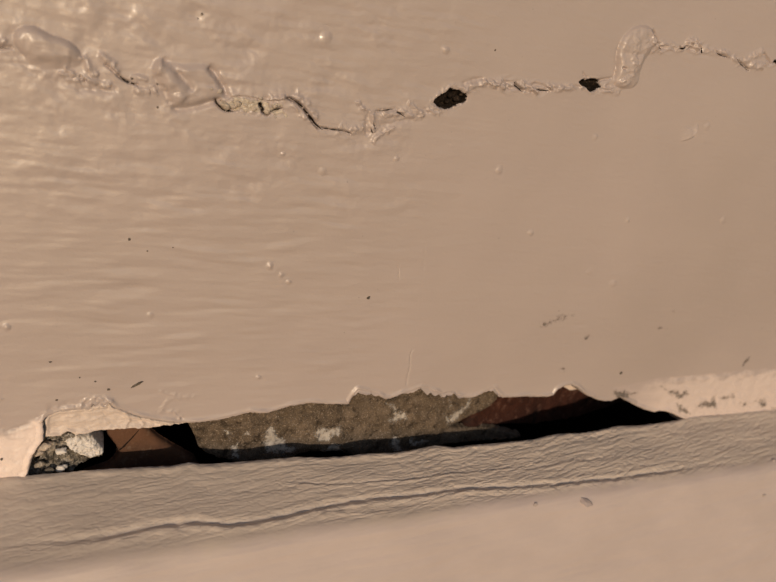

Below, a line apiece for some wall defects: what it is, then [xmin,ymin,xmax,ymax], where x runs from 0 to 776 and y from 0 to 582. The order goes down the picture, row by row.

crack [0,26,163,108]
crack [186,67,627,151]
hole [433,88,467,109]
hole [579,78,600,92]
crack [650,30,776,78]
peeling [407,387,464,398]